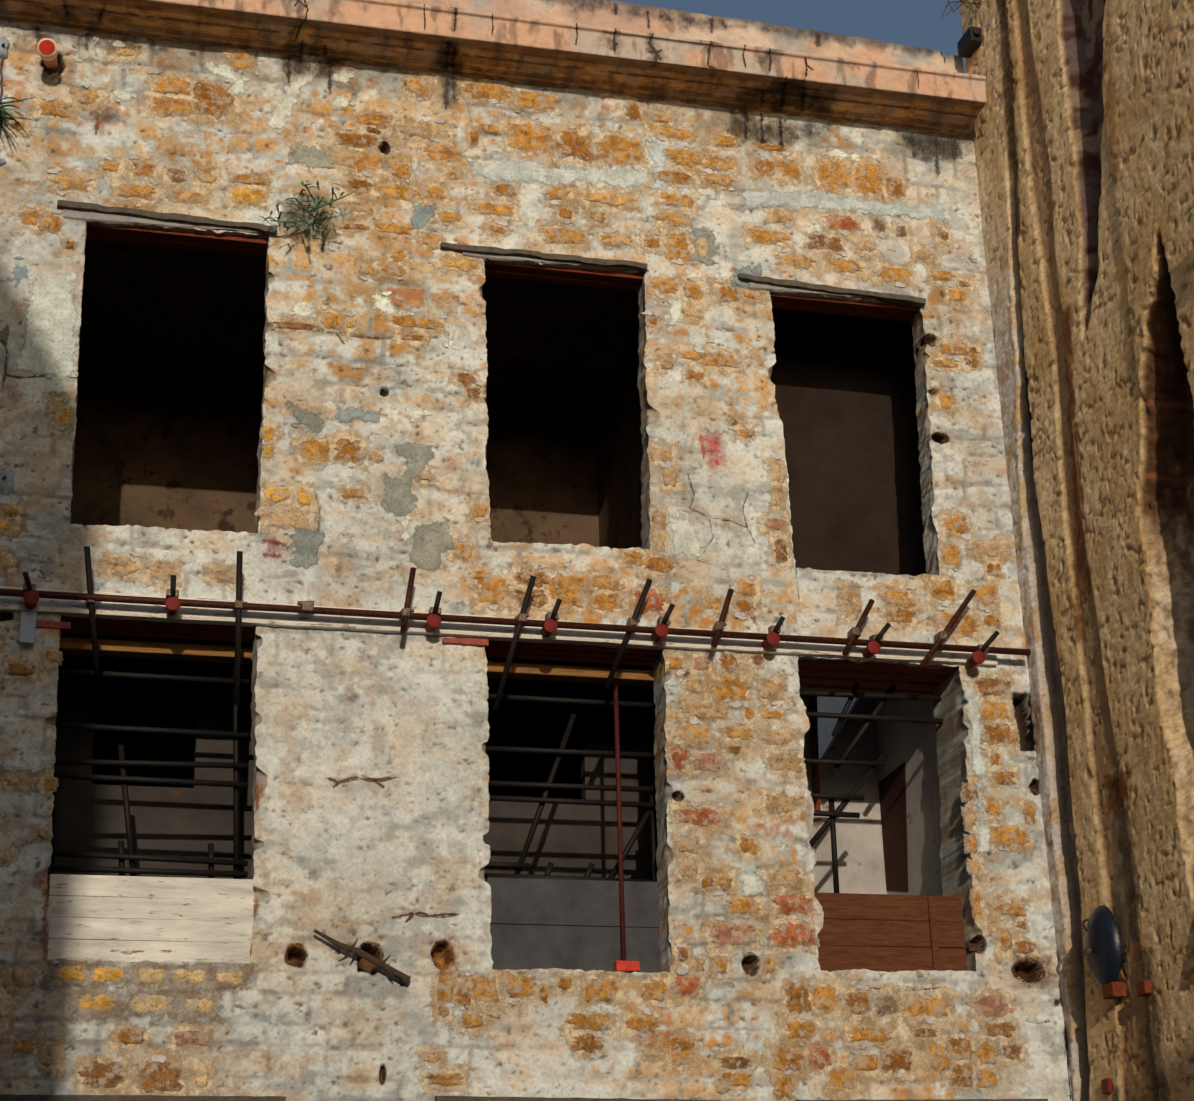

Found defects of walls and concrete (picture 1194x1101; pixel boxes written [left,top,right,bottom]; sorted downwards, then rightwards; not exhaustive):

water stain [281,40,345,93]
water stain [439,41,463,109]
water stain [734,77,834,154]
water stain [902,132,962,175]
peeling [322,69,985,403]
spalling [445,440,705,621]
crack [688,474,756,552]
spalling [757,456,793,571]
spalling [835,507,1015,640]
spalling [664,649,806,821]
spalling [960,668,1048,983]
spalling [430,791,1029,1101]